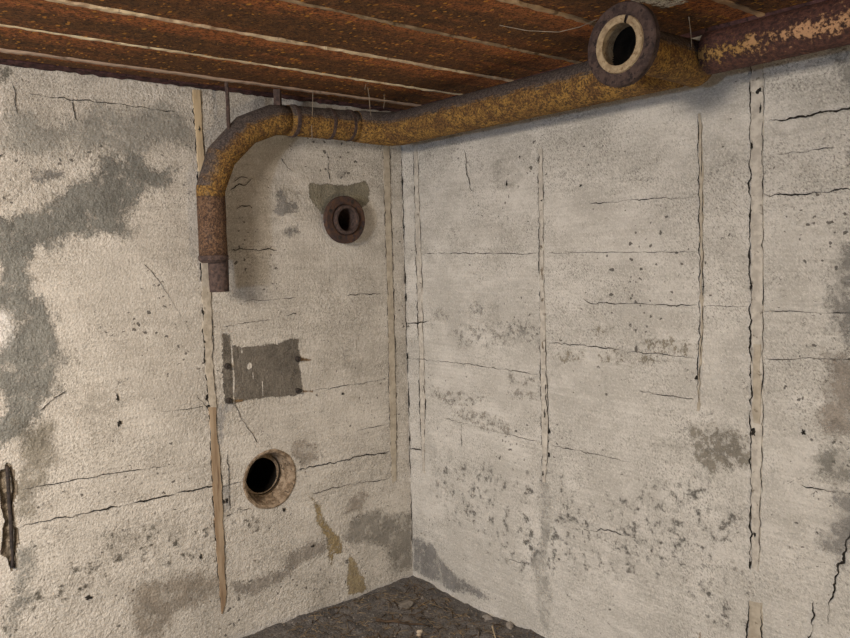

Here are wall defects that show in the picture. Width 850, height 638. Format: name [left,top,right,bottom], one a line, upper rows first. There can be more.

damp [0,151,178,516]
crack [298,65,850,564]
crack [21,263,296,614]
spalling [0,463,19,571]
rust [312,499,366,595]
crack [745,604,763,638]
crack [808,535,850,638]